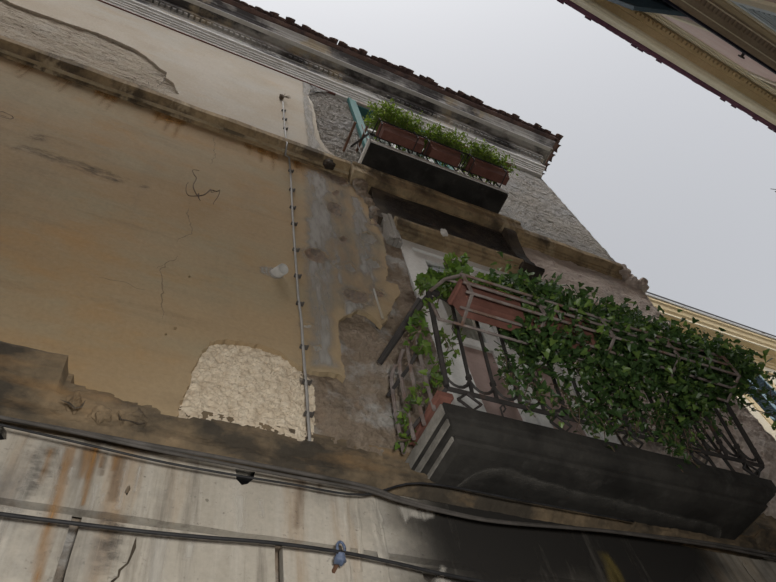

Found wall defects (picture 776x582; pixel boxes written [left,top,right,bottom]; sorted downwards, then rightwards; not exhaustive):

spalling [0,0,177,95]
spalling [178,218,438,456]
crack [111,538,136,582]